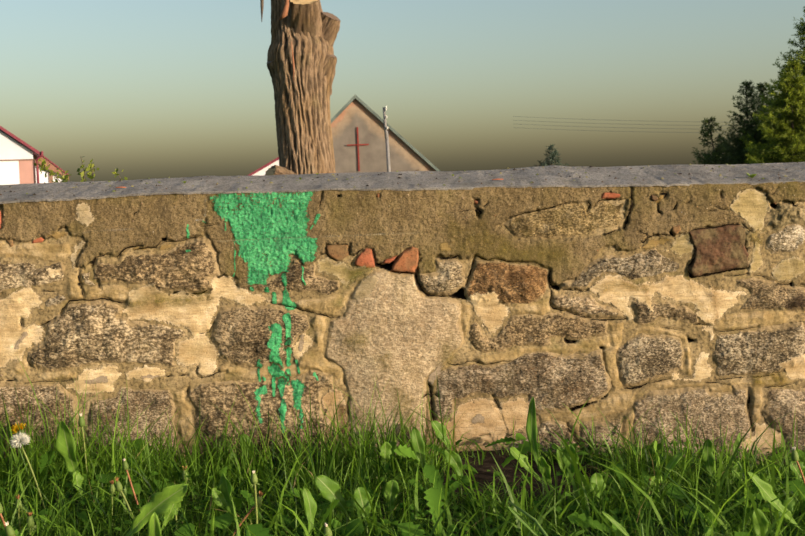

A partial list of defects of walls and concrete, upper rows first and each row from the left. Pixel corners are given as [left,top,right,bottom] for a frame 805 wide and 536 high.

crack [587,188,671,243]
crack [691,193,751,231]
crack [20,220,215,326]